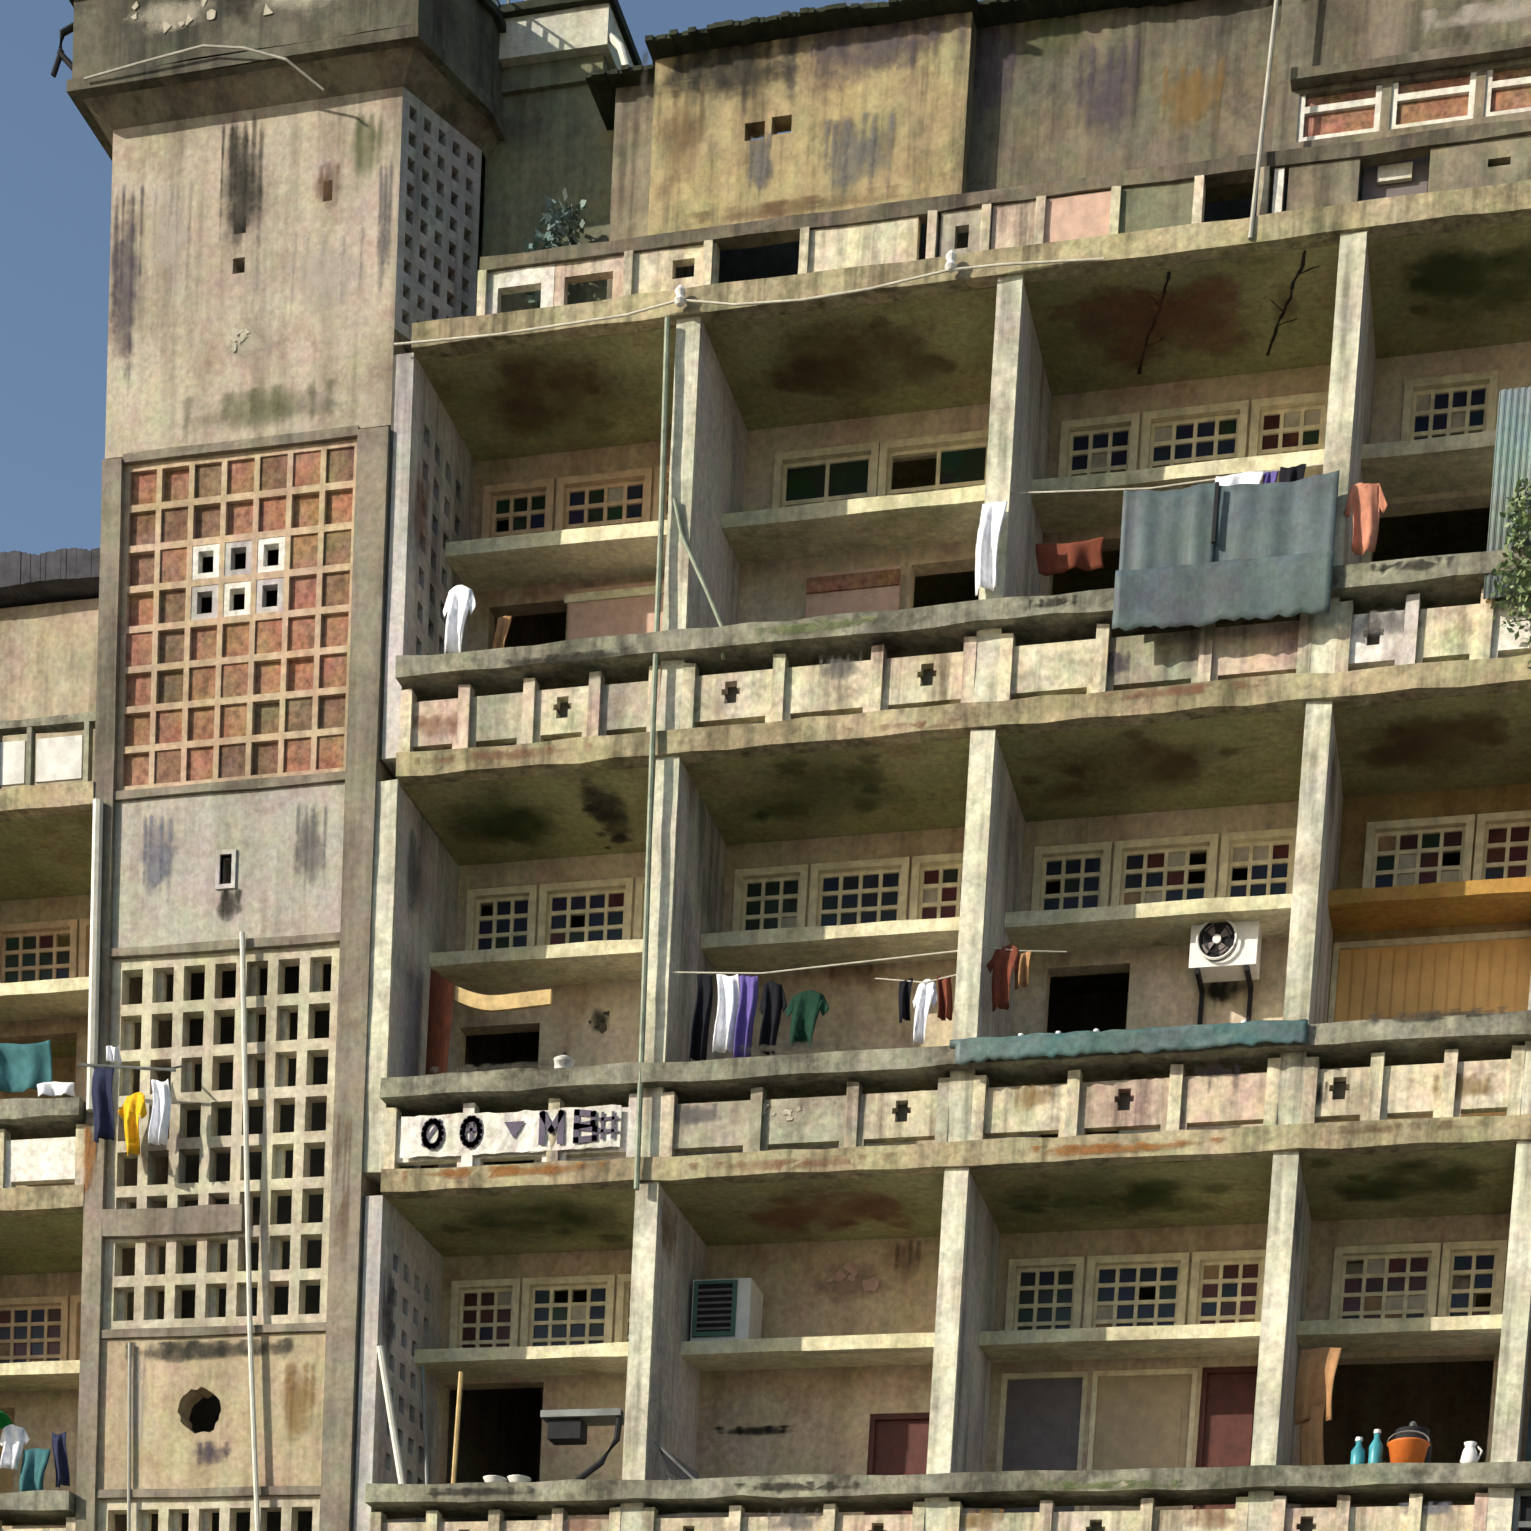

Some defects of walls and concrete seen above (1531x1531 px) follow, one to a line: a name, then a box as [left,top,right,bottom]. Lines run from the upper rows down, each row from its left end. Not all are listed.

peeling [131,0,216,34]
peeling [263,0,313,16]
damp [221,118,262,241]
damp [750,135,771,185]
damp [825,113,894,186]
damp [112,183,190,352]
crack [1137,272,1171,374]
crack [1266,250,1319,356]
damp [144,817,170,886]
damp [296,807,326,876]
corrosion [1033,1140,1187,1155]